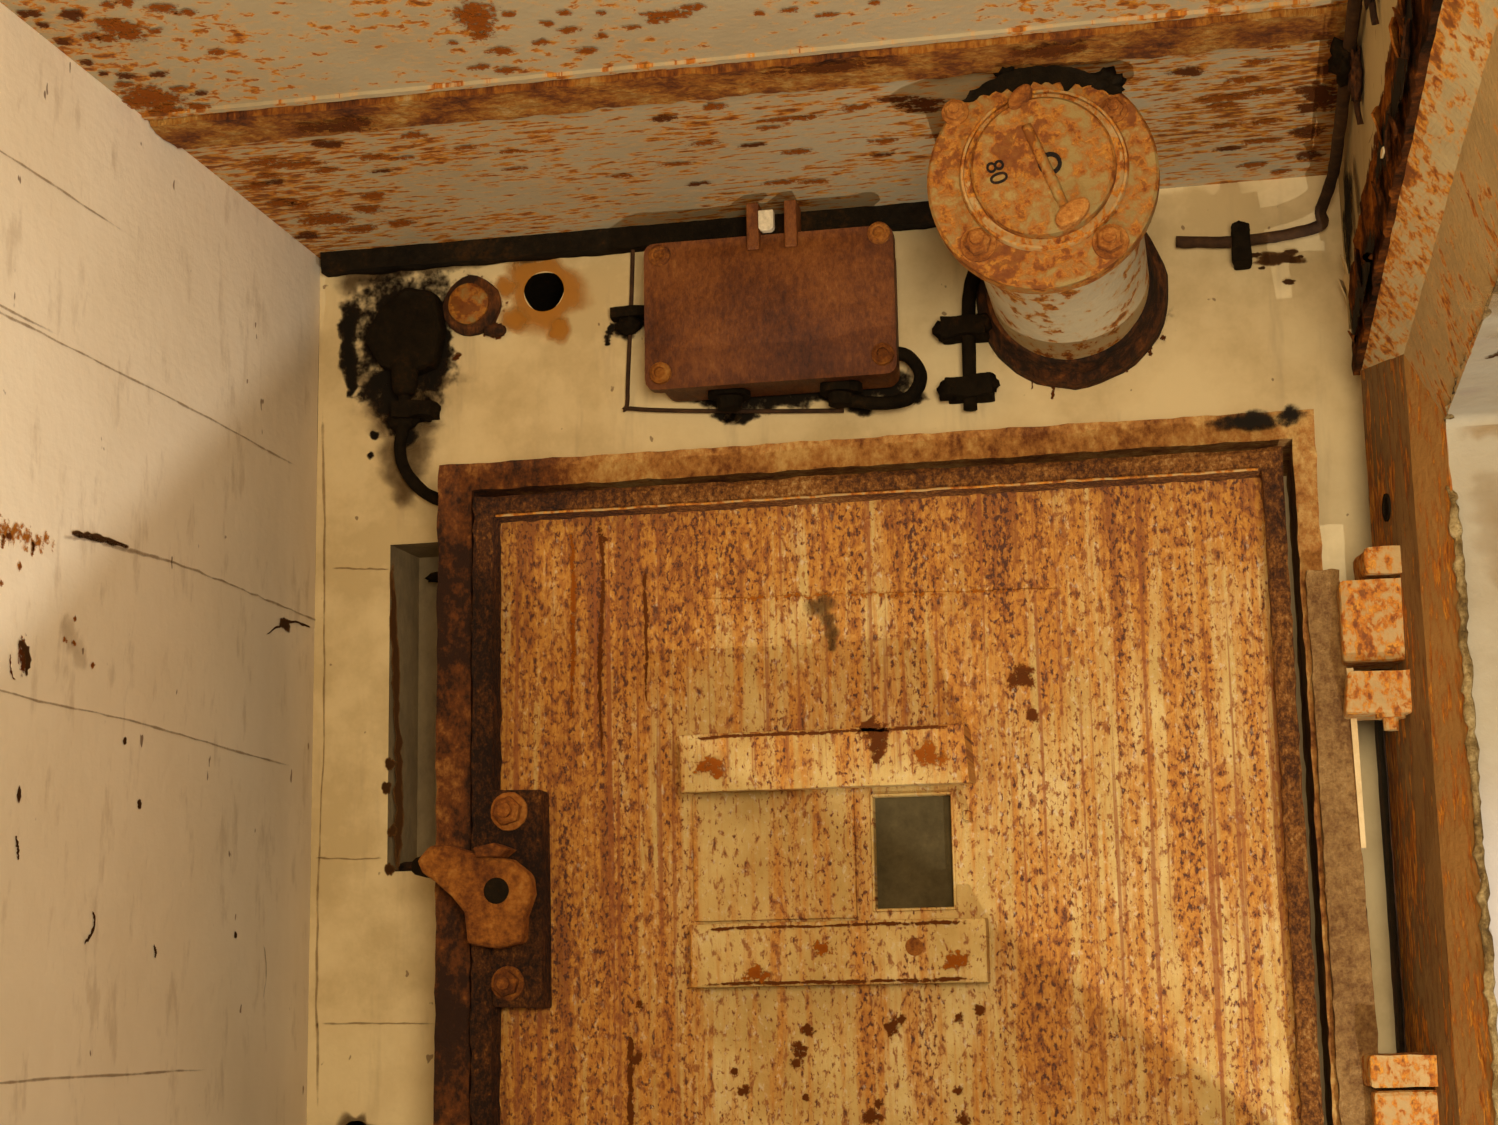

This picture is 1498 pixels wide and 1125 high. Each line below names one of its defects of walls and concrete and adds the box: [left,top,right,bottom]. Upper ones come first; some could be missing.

corrosion [17,0,199,46]
corrosion [448,0,522,75]
corrosion [533,4,707,54]
corrosion [754,7,841,18]
corrosion [80,61,211,114]
corrosion [741,96,947,157]
corrosion [1165,67,1206,77]
corrosion [1193,42,1337,175]
corrosion [242,118,429,239]
corrosion [481,259,582,341]
damp [369,406,435,504]
corrosion [0,514,54,571]